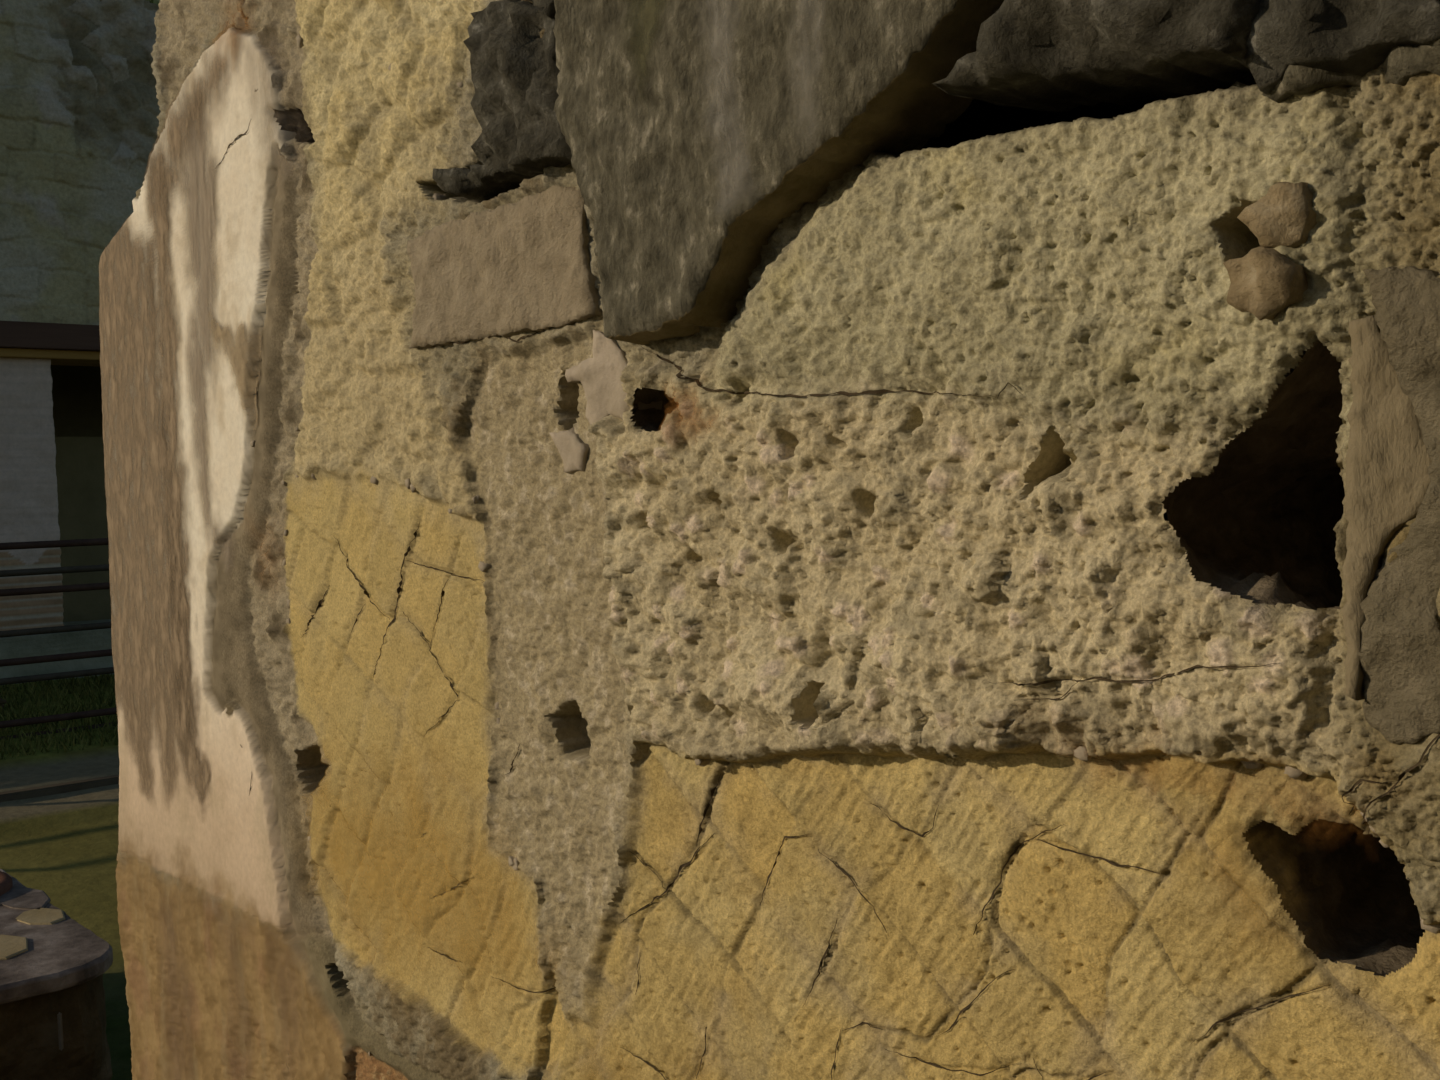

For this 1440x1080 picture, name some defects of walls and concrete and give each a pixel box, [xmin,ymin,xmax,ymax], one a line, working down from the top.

spalling [920,97,1167,150]
spalling [1213,199,1260,260]
water stain [99,56,261,799]
peeling [549,330,679,474]
crack [638,344,1023,399]
spalling [155,0,603,1080]
peeling [1161,266,1440,745]
crack [302,522,484,736]
crack [619,774,721,924]
spalling [526,742,1440,1080]
crack [973,824,1159,935]
crack [831,969,1043,1079]